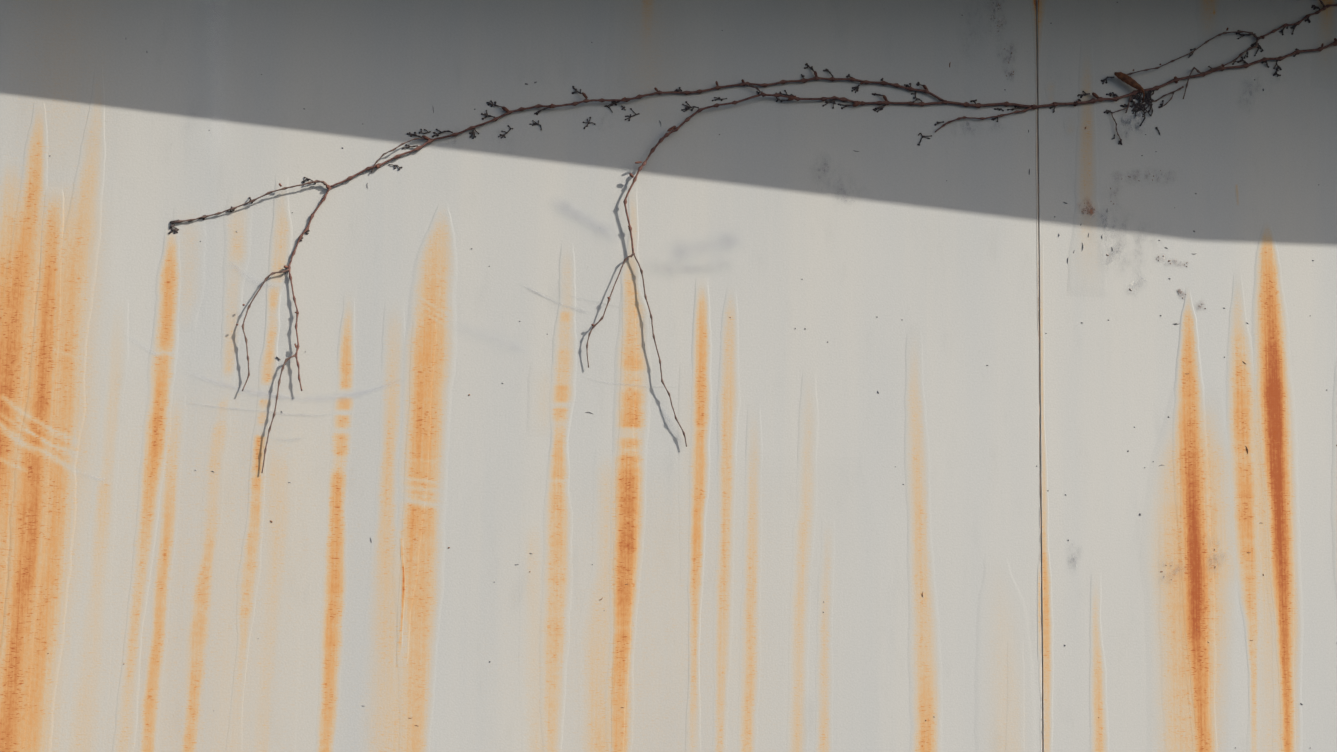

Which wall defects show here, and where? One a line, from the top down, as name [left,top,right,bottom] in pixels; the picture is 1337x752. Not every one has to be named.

corrosion [1310,0,1337,89]
corrosion [0,0,882,752]
corrosion [1140,221,1304,752]